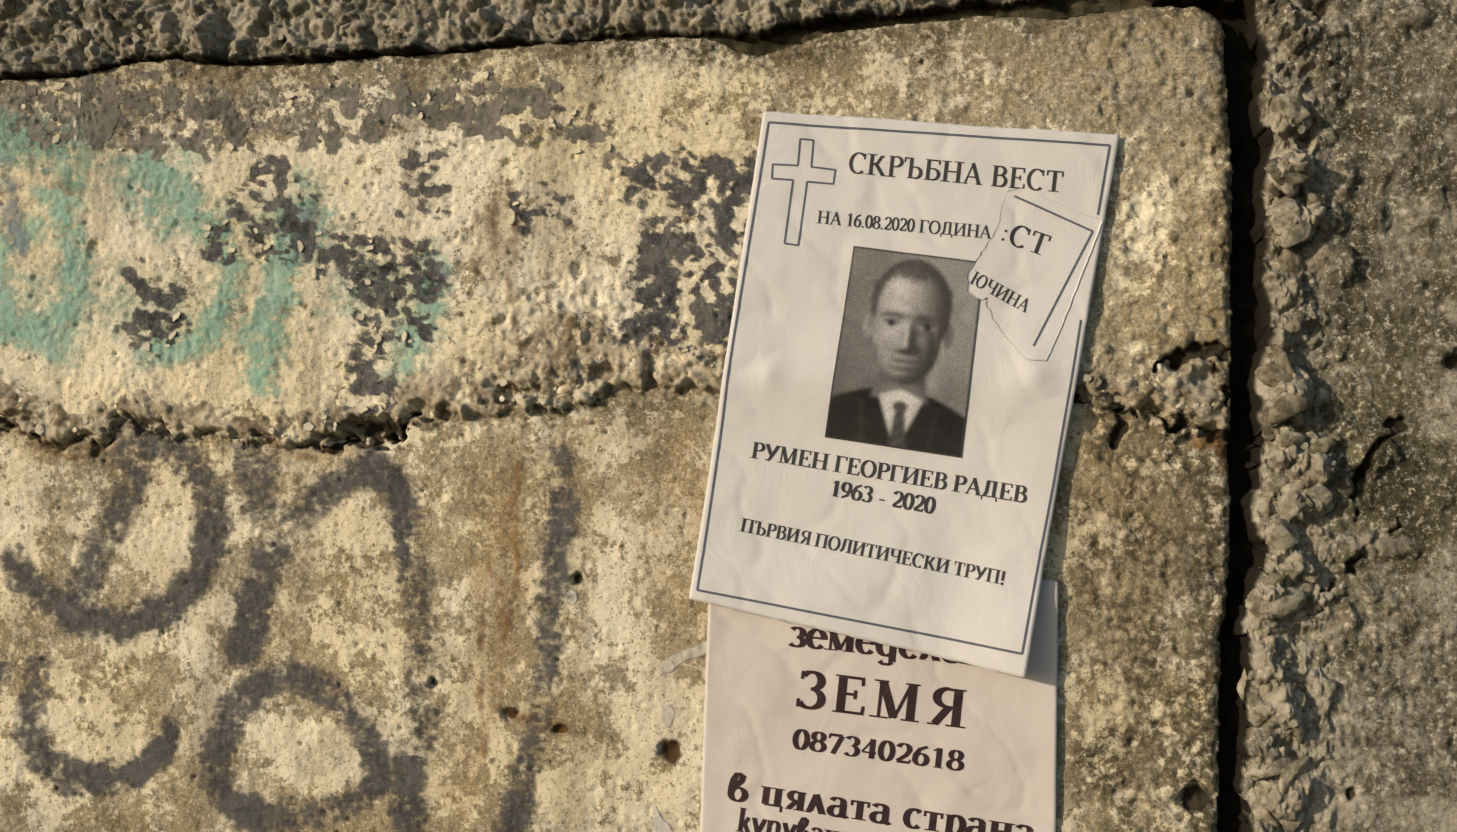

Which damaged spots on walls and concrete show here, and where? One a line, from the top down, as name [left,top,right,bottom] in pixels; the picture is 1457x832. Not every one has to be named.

crack [597,0,1152,57]
crack [126,45,532,67]
crack [0,414,42,443]
crack [77,426,249,458]
crack [296,412,431,455]
crack [1073,9,1262,832]